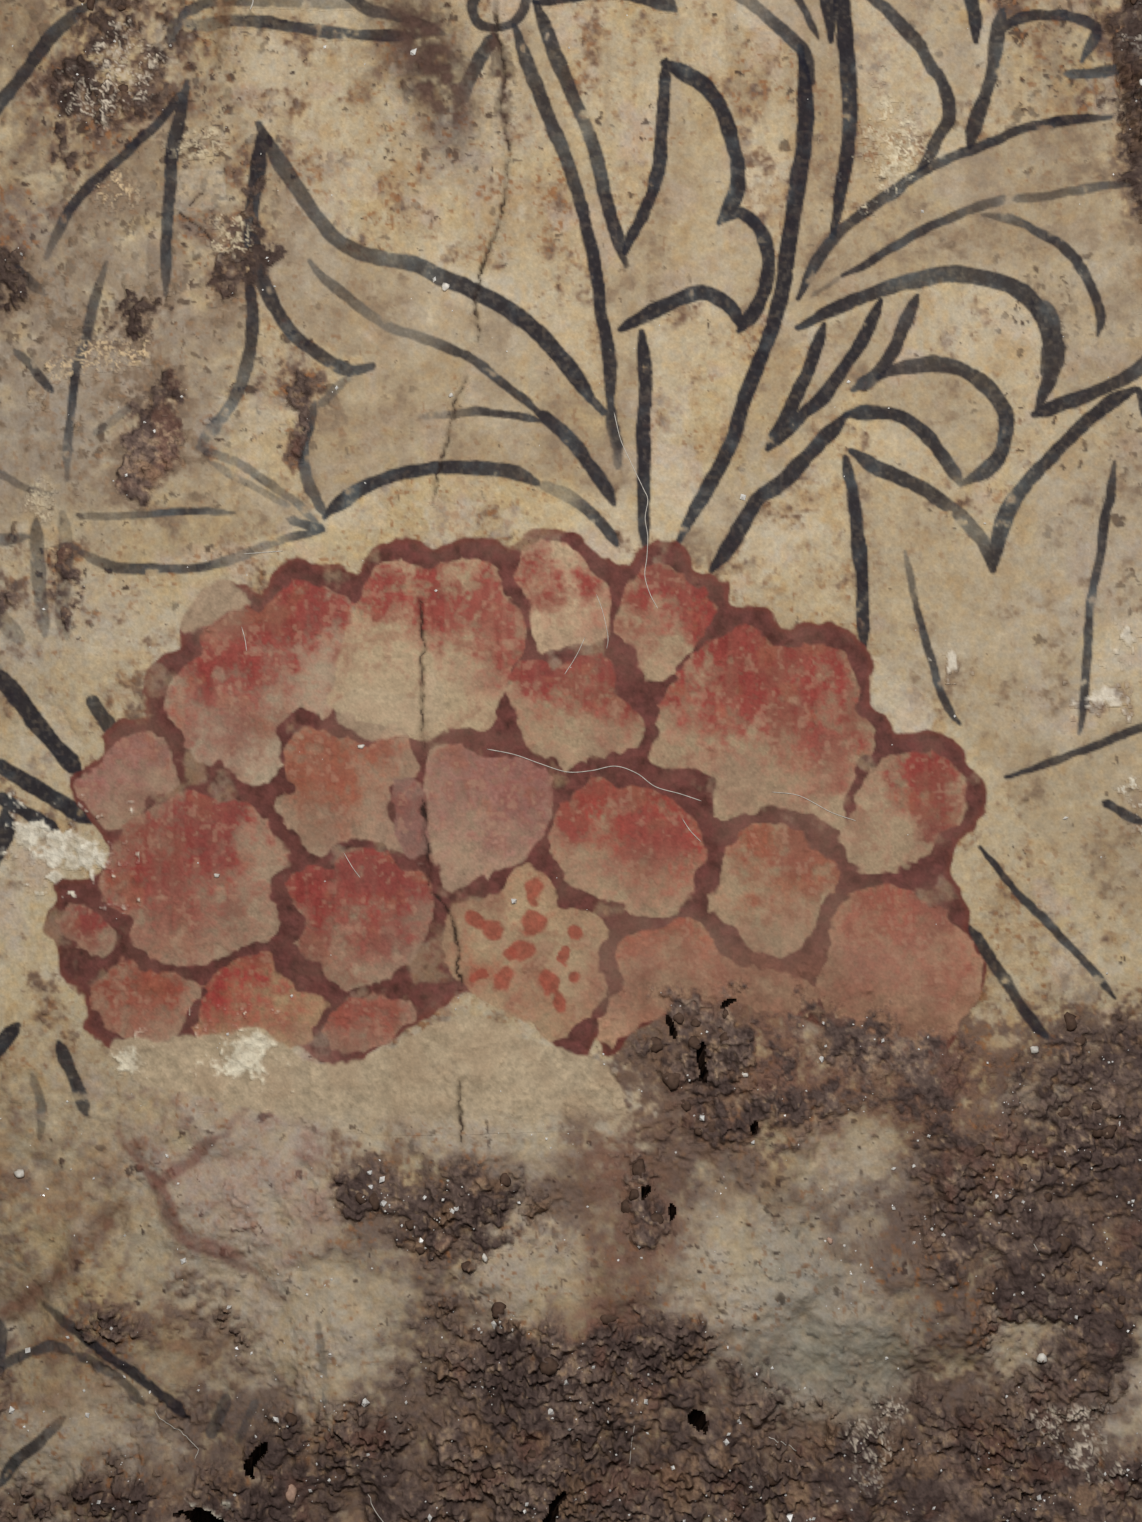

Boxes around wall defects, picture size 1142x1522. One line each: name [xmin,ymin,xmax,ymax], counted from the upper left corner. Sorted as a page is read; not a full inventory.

crack [1085,0,1136,55]
water stain [1100,0,1142,60]
crack [428,0,516,507]
water stain [1105,775,1142,862]
water stain [606,917,990,1128]
water stain [137,1280,221,1387]
water stain [715,1203,934,1498]
water stain [22,1360,133,1435]
crack [243,1442,268,1479]
water stain [1013,1389,1142,1488]
crack [173,1507,224,1522]
crack [542,1490,567,1522]